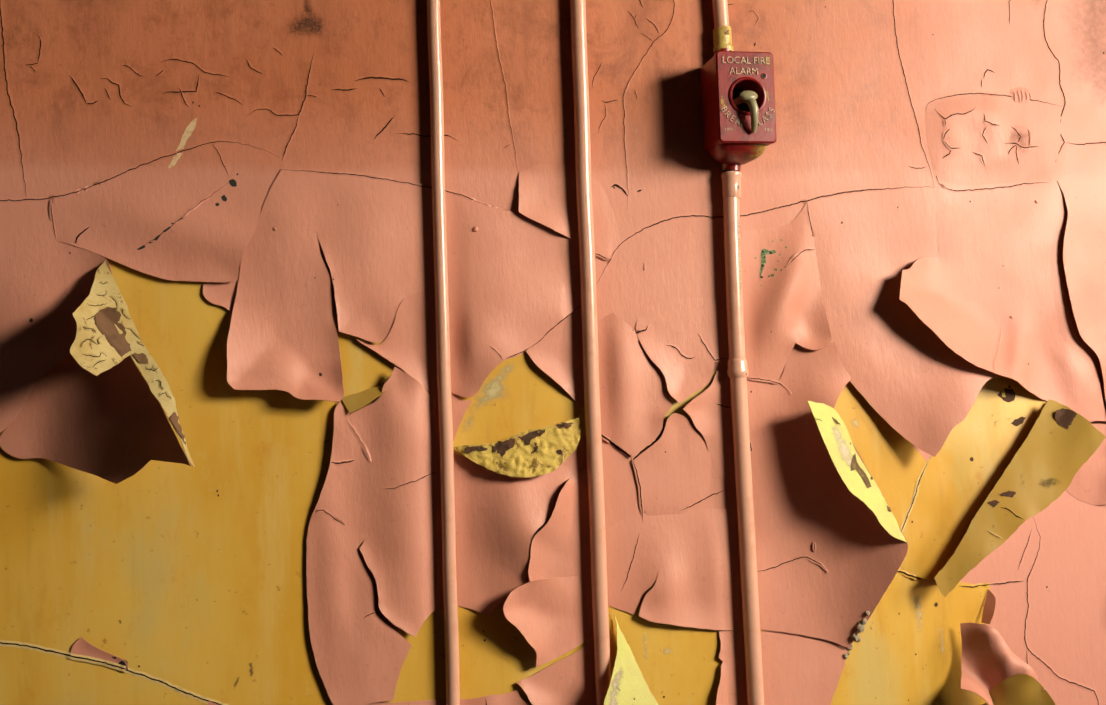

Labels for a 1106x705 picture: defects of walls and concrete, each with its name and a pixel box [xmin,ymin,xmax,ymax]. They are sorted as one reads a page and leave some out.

damp [293,17,322,32]
crack [0,0,513,250]
crack [591,0,1106,285]
peeling [0,118,446,705]
crack [330,420,372,466]
peeling [445,164,748,705]
crack [601,419,666,592]
crack [632,325,726,362]
crack [901,459,929,533]
peeling [741,173,1106,705]
crack [0,640,229,705]
crack [959,516,1100,705]